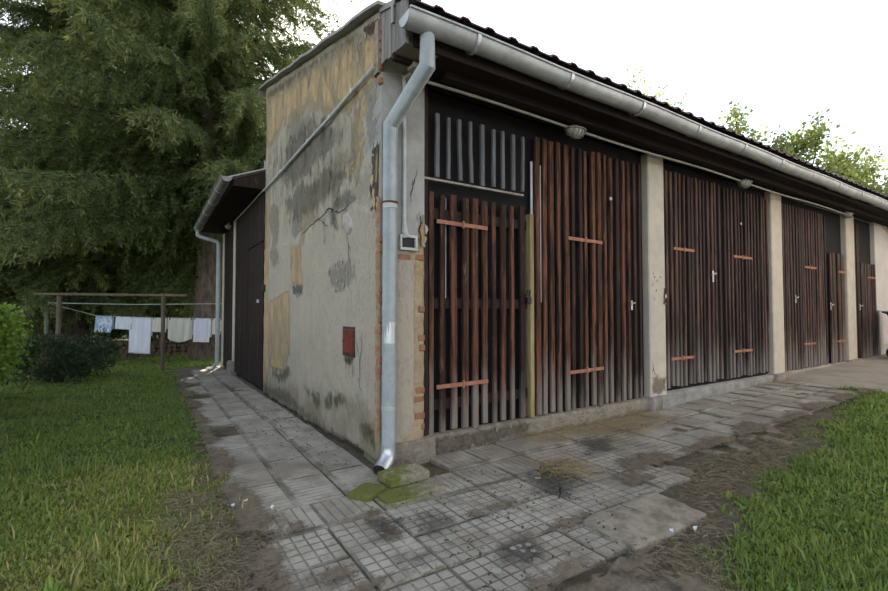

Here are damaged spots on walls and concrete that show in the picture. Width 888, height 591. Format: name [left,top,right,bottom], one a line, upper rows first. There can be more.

crack [304,186,356,233]
spalling [366,130,383,442]